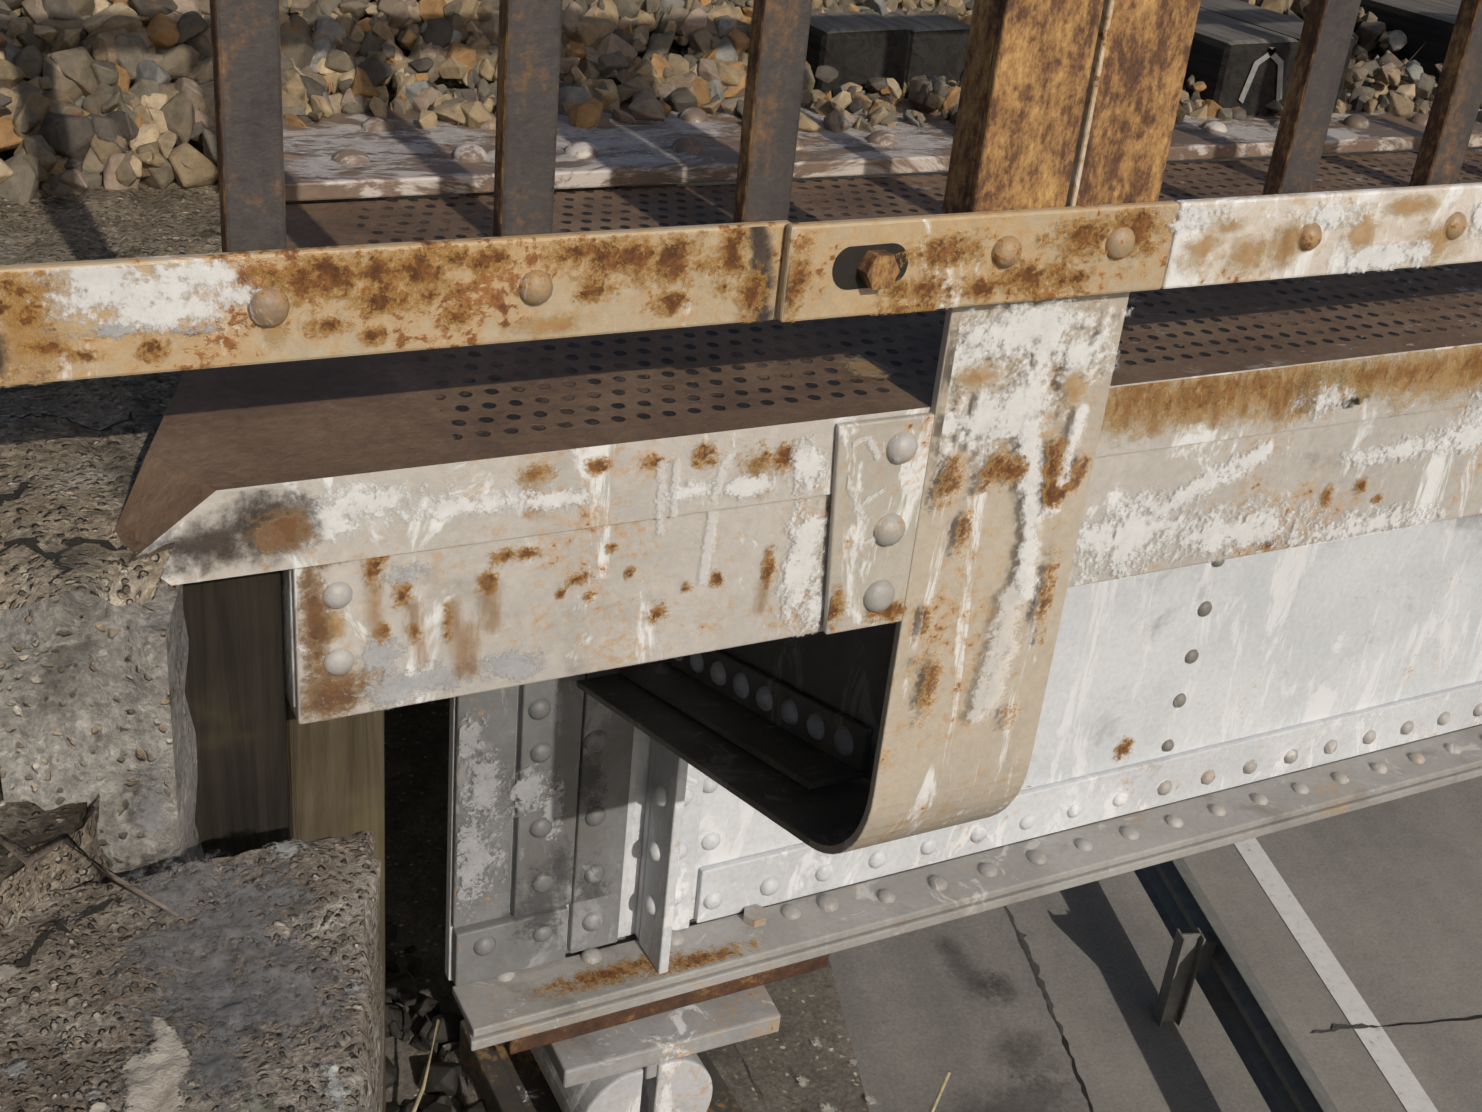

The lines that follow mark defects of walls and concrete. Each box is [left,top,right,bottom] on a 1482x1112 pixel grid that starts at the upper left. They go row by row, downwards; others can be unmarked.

rust [0,270,104,381]
rust [252,243,513,347]
rust [513,227,814,334]
rust [875,206,1168,316]
crack [0,482,36,504]
rust [932,437,1092,556]
crack [0,536,127,578]
rust [297,564,384,721]
rust [361,556,422,644]
rust [474,546,542,596]
rust [524,938,758,999]
spalling [83,1015,193,1112]